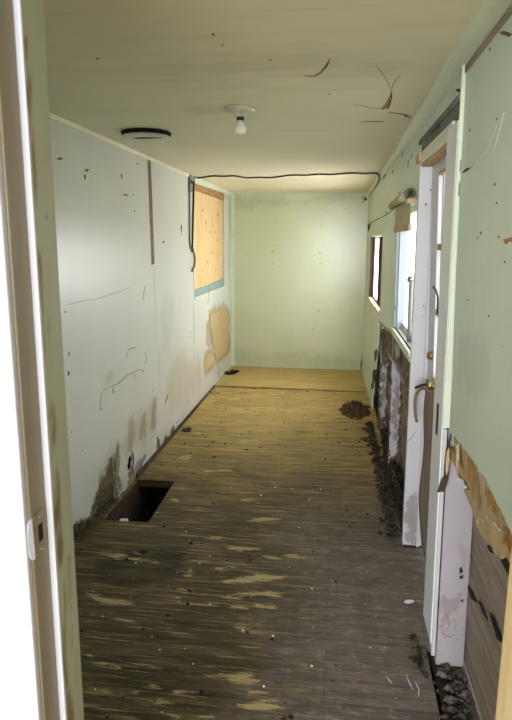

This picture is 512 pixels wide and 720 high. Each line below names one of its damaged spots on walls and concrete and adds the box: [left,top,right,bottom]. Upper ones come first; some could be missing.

crack [304,59,330,77]
crack [362,112,411,122]
crack [68,266,168,406]
peeling [204,305,230,376]
damp [75,444,146,535]